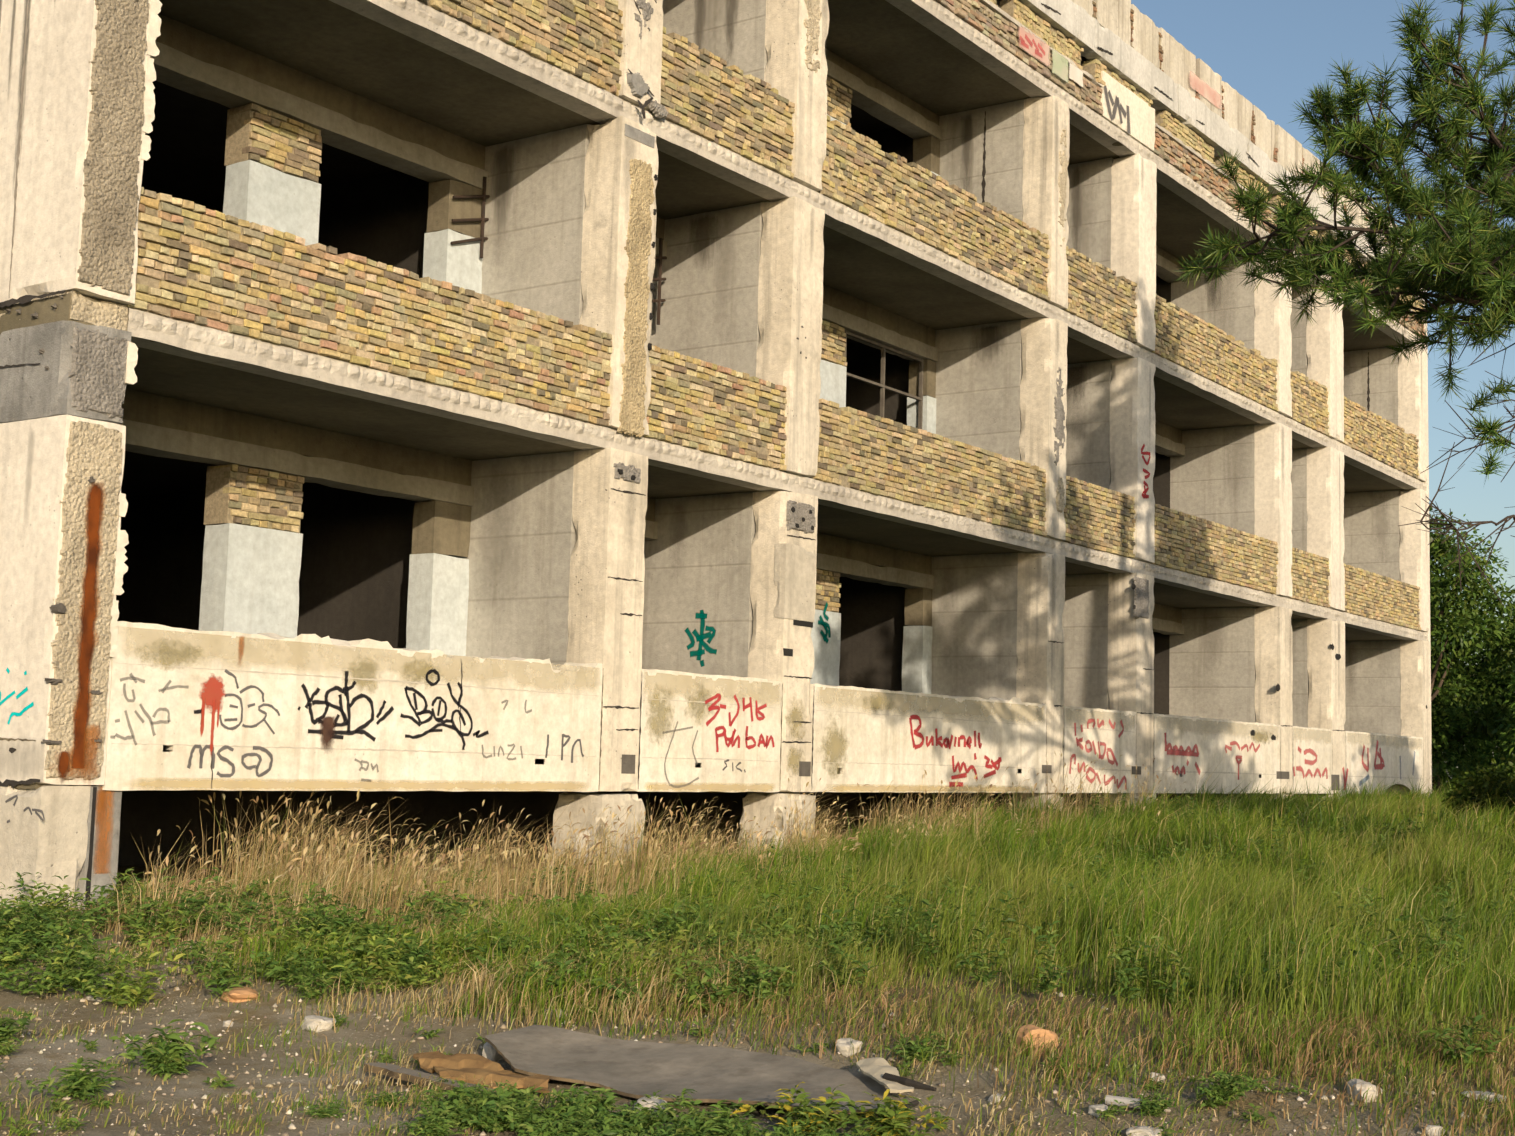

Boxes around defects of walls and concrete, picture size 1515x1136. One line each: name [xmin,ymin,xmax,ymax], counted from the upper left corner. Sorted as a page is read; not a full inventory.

spalling [75,0,162,296]
spalling [634,0,657,40]
spalling [804,0,822,77]
spalling [617,159,658,438]
rust [58,484,103,779]
spalling [41,326,138,780]
rust [96,790,112,874]